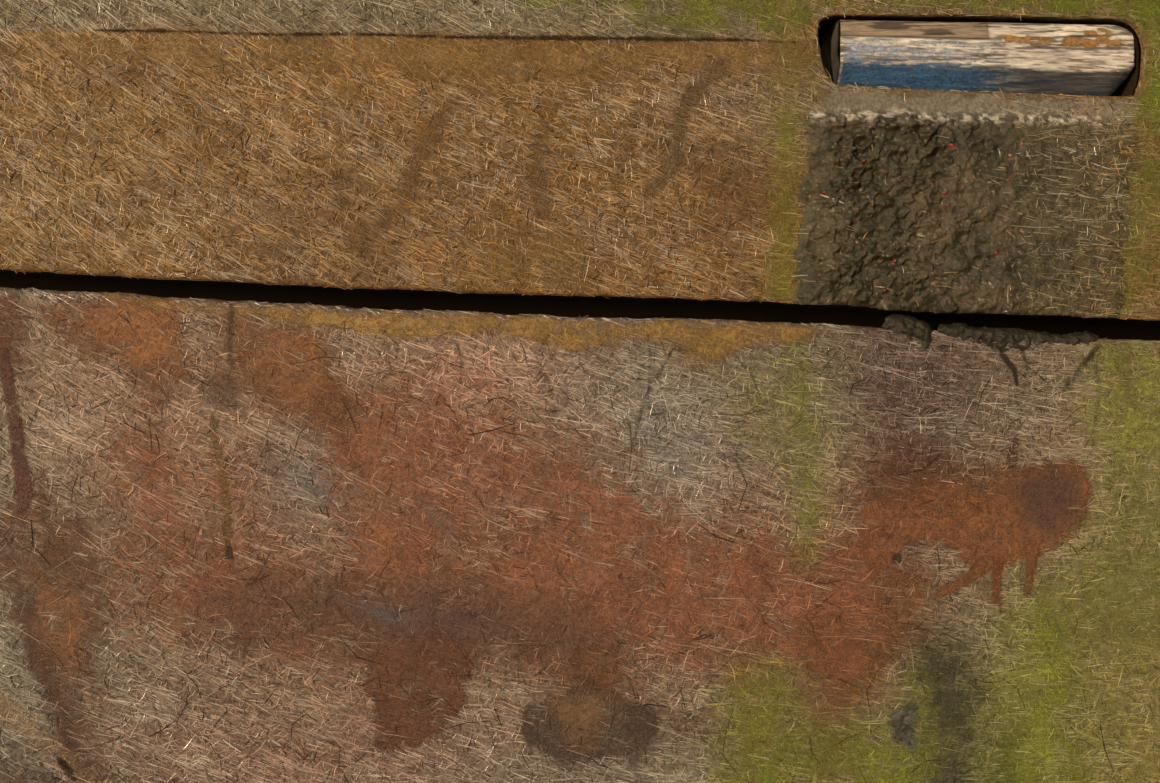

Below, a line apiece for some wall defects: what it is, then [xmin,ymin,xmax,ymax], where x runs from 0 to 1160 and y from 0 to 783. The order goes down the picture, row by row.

spalling [787,39,1142,318]
rust [48,298,190,387]
rust [0,298,106,781]
rust [210,415,232,559]
rust [522,684,657,766]